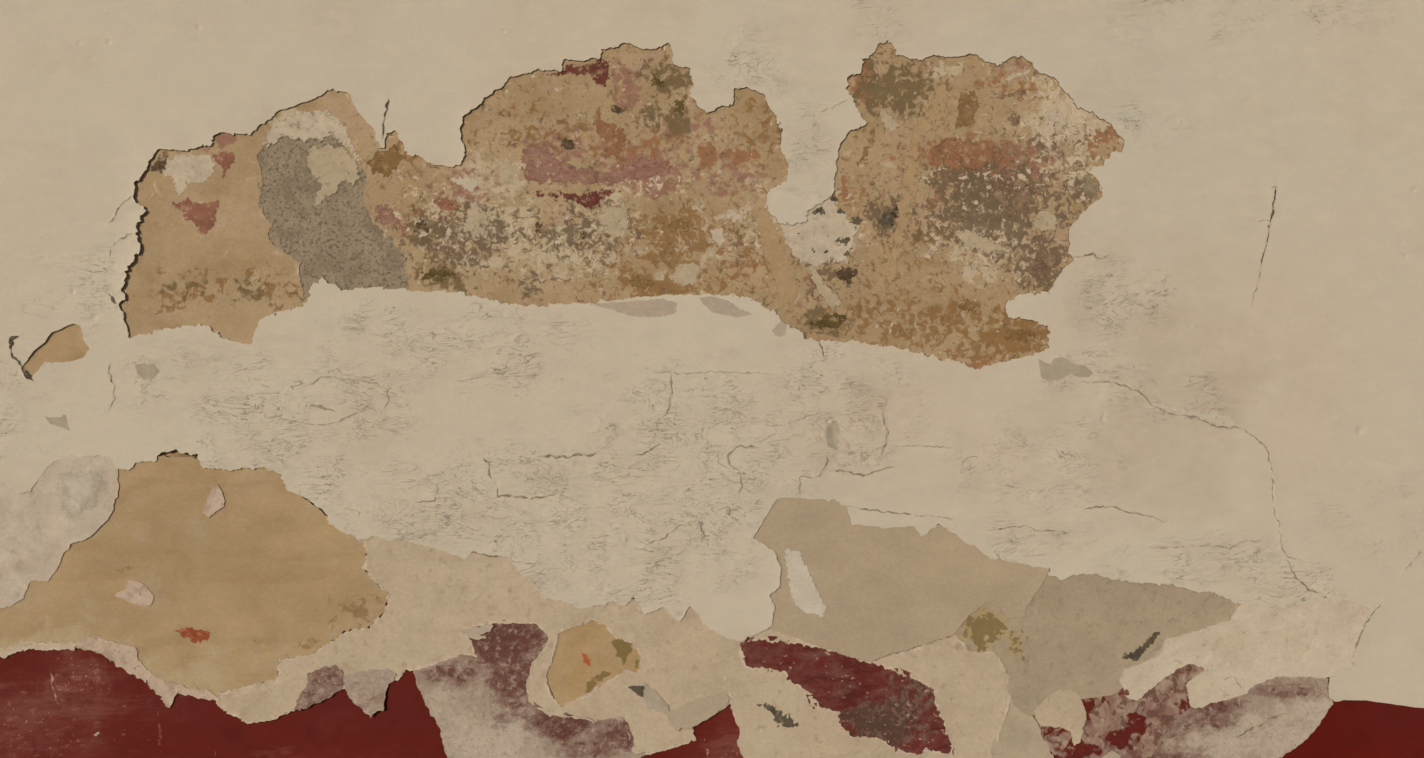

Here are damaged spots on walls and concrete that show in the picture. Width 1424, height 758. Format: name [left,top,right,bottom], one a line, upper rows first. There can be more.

spalling [119,41,1124,382]
crack [1251,186,1277,305]
spalling [22,324,89,379]
crack [484,459,553,499]
crack [537,452,596,460]
crack [635,371,769,456]
crack [727,445,758,491]
crack [799,414,979,520]
crack [987,381,1331,598]
peeling [0,454,1376,758]